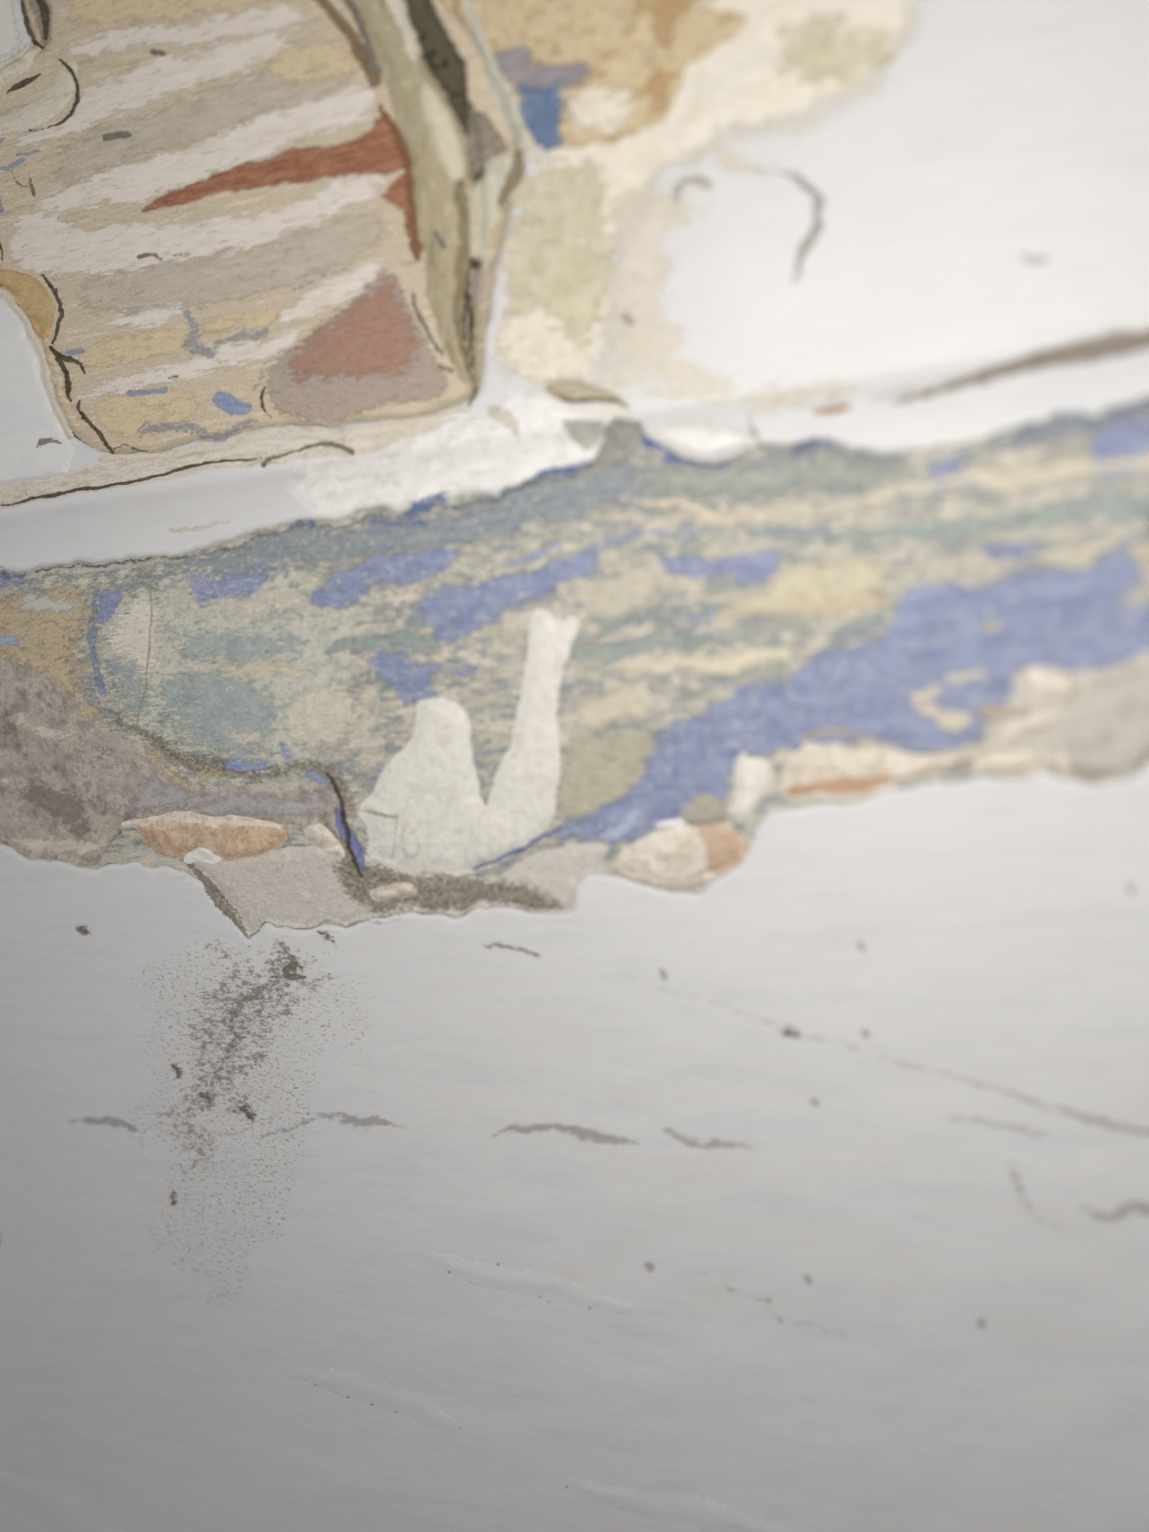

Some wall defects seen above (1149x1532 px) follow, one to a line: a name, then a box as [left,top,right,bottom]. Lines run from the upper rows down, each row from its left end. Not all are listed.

crack [674,176,712,197]
crack [757,168,824,273]
peeling [0,0,1149,939]
crack [782,1026,800,1037]